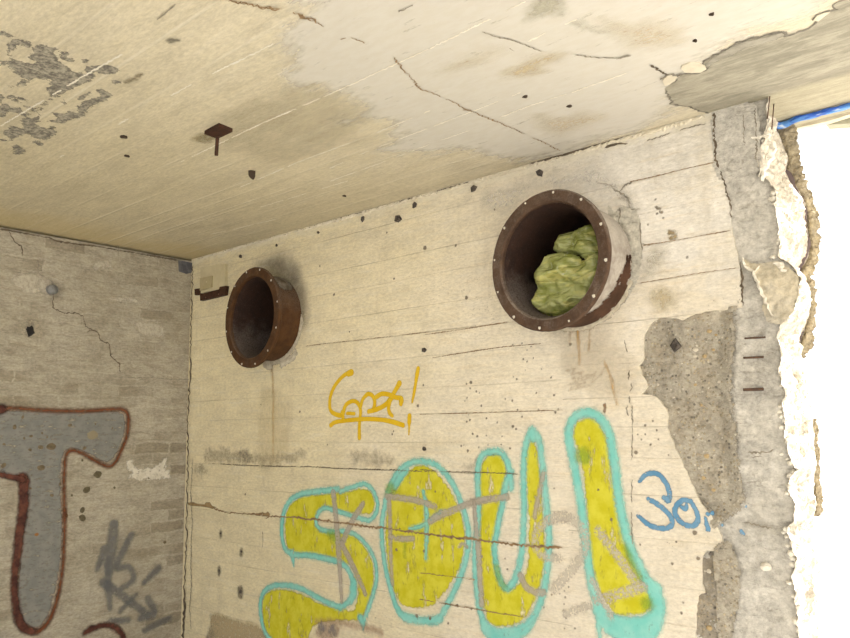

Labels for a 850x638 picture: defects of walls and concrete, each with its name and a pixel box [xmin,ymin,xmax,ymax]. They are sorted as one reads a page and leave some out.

peeling [0,31,121,155]
crack [229,0,324,27]
crack [394,57,732,250]
corrosion [569,255,632,339]
spalling [640,0,850,638]
crack [1,229,562,638]